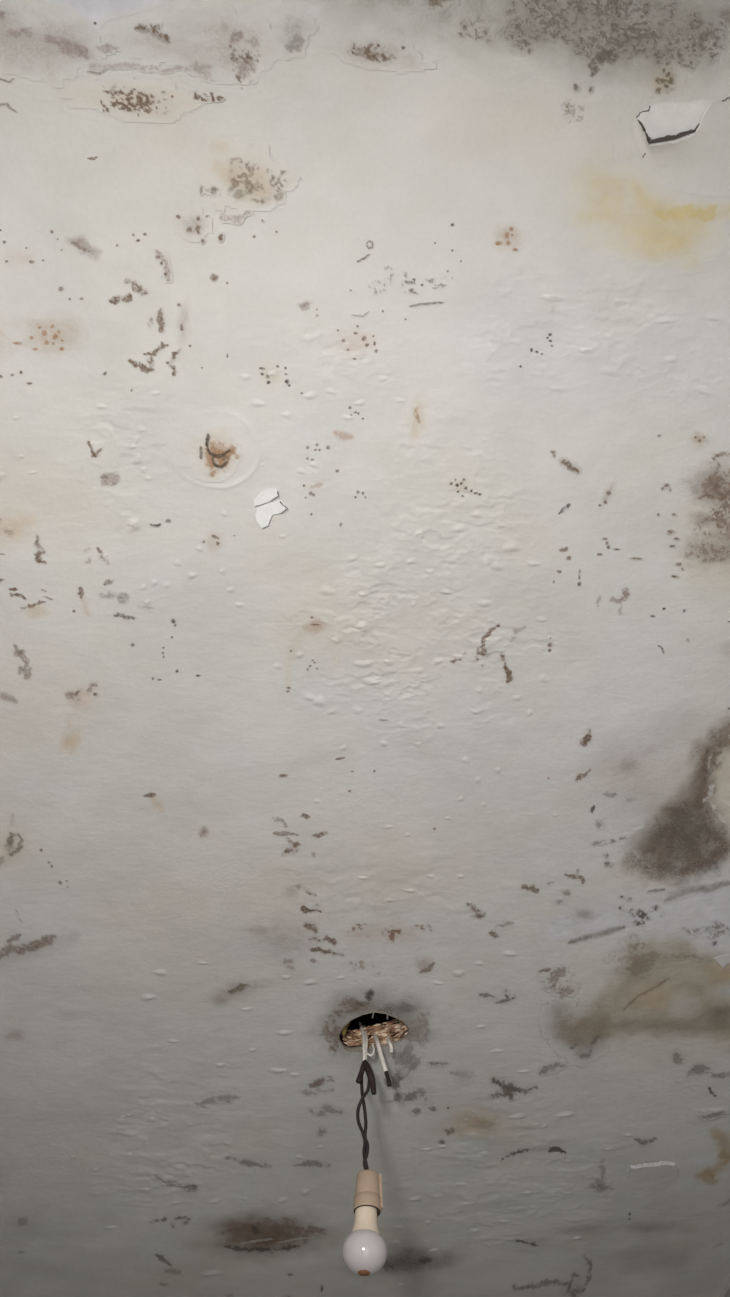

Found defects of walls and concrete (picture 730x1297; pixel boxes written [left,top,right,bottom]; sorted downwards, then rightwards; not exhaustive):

leakage [0,0,730,123]
peeling [630,96,730,198]
leakage [562,142,730,275]
corrosion [197,435,244,480]
peeling [254,488,288,528]
leakage [657,439,730,667]
leakage [449,623,528,685]
leakage [520,685,730,980]
spalling [340,1012,404,1047]
leakage [193,881,620,1146]
corrosion [685,1125,730,1186]
leakage [148,1199,477,1287]